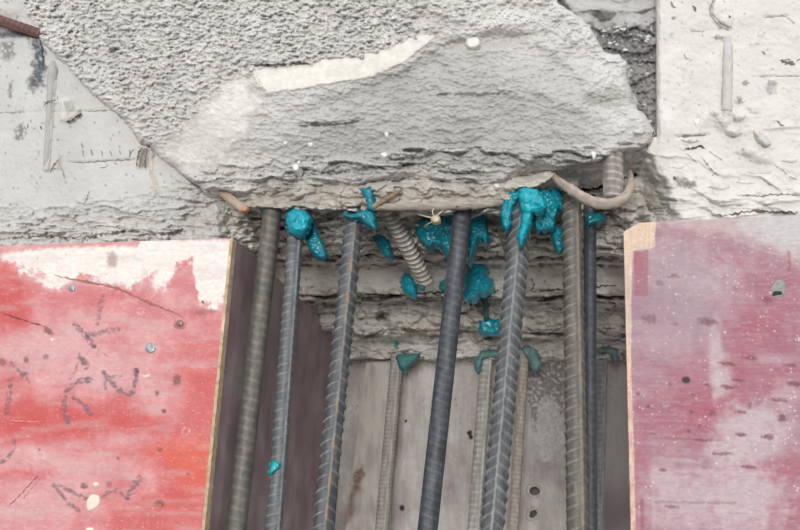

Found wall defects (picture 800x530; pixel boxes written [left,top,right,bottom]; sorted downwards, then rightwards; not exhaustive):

corrosion [0,15,47,39]
spalling [21,0,656,530]